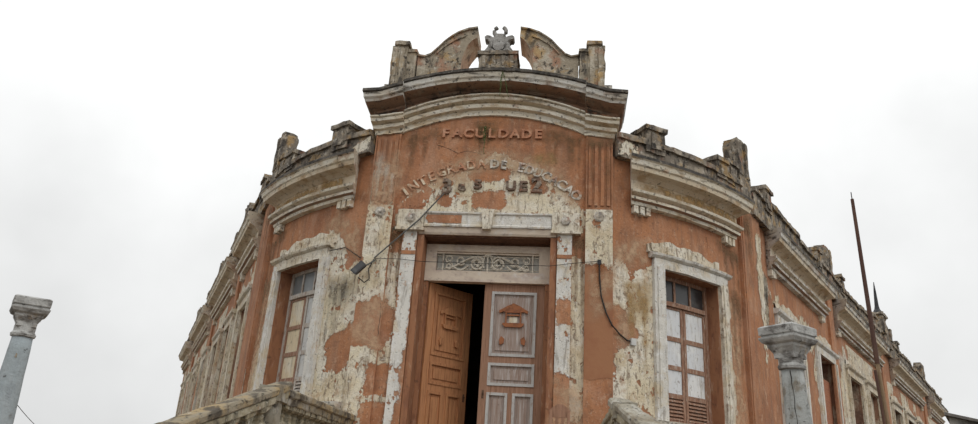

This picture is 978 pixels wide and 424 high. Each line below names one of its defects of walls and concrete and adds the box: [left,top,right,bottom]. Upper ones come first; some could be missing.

peeling [311,152,655,424]